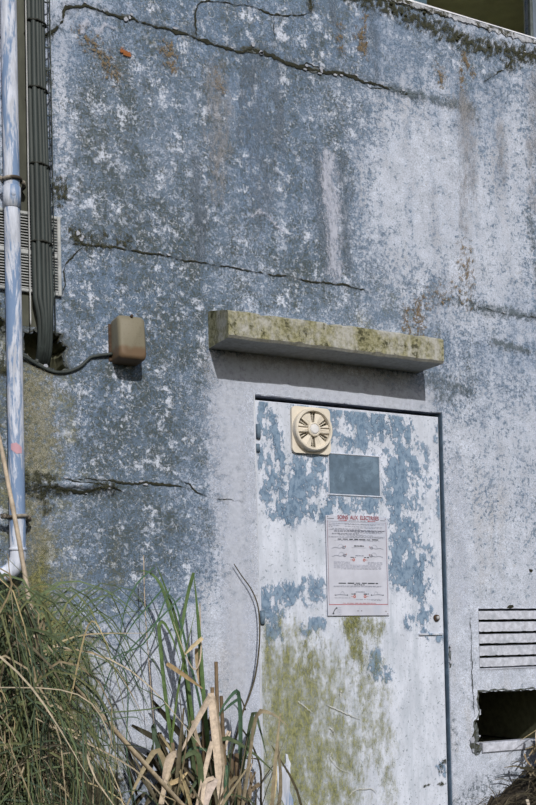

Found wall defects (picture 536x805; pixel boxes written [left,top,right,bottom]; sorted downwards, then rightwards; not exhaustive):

crack [45,0,417,95]
crack [62,240,365,295]
spalling [22,327,69,371]
crack [25,472,234,501]
peeling [204,350,453,743]
spalling [478,605,536,658]
spalling [469,687,536,755]